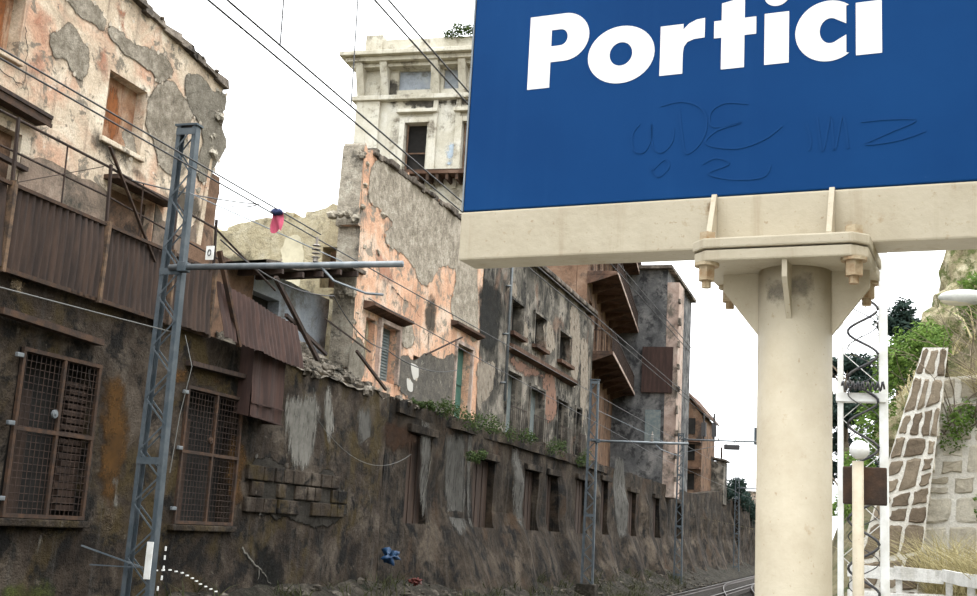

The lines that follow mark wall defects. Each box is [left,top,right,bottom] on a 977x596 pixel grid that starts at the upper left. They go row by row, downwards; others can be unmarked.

flaking render [50,0,228,194]
flaking render [326,149,479,342]
damp [285,386,334,470]
flaking render [398,325,456,414]